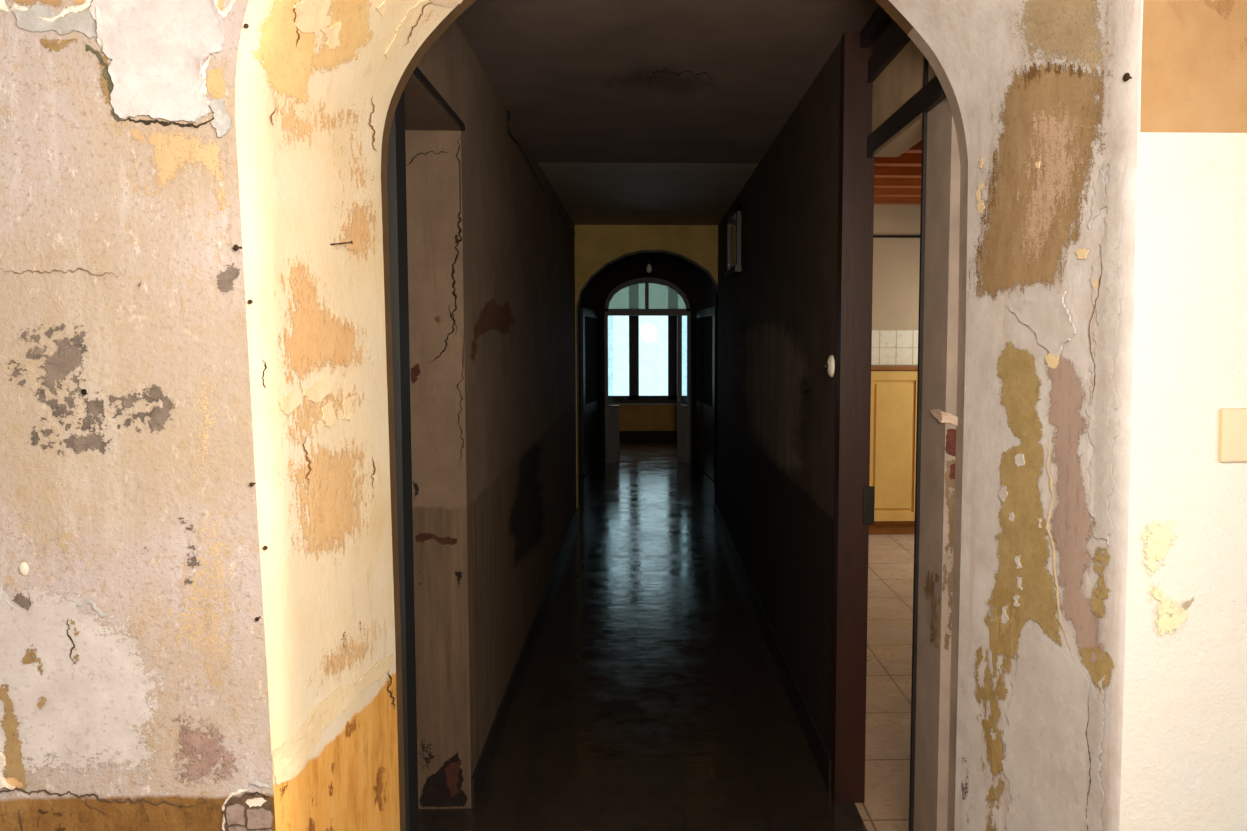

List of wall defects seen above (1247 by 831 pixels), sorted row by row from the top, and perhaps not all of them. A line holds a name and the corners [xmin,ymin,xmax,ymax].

peeling [0,0,236,138]
peeling [251,0,463,266]
crack [1,268,122,280]
crack [406,138,464,473]
water stain [0,319,251,787]
peeling [1086,383,1119,618]
flaking render [222,618,397,831]
flaking render [417,738,467,808]